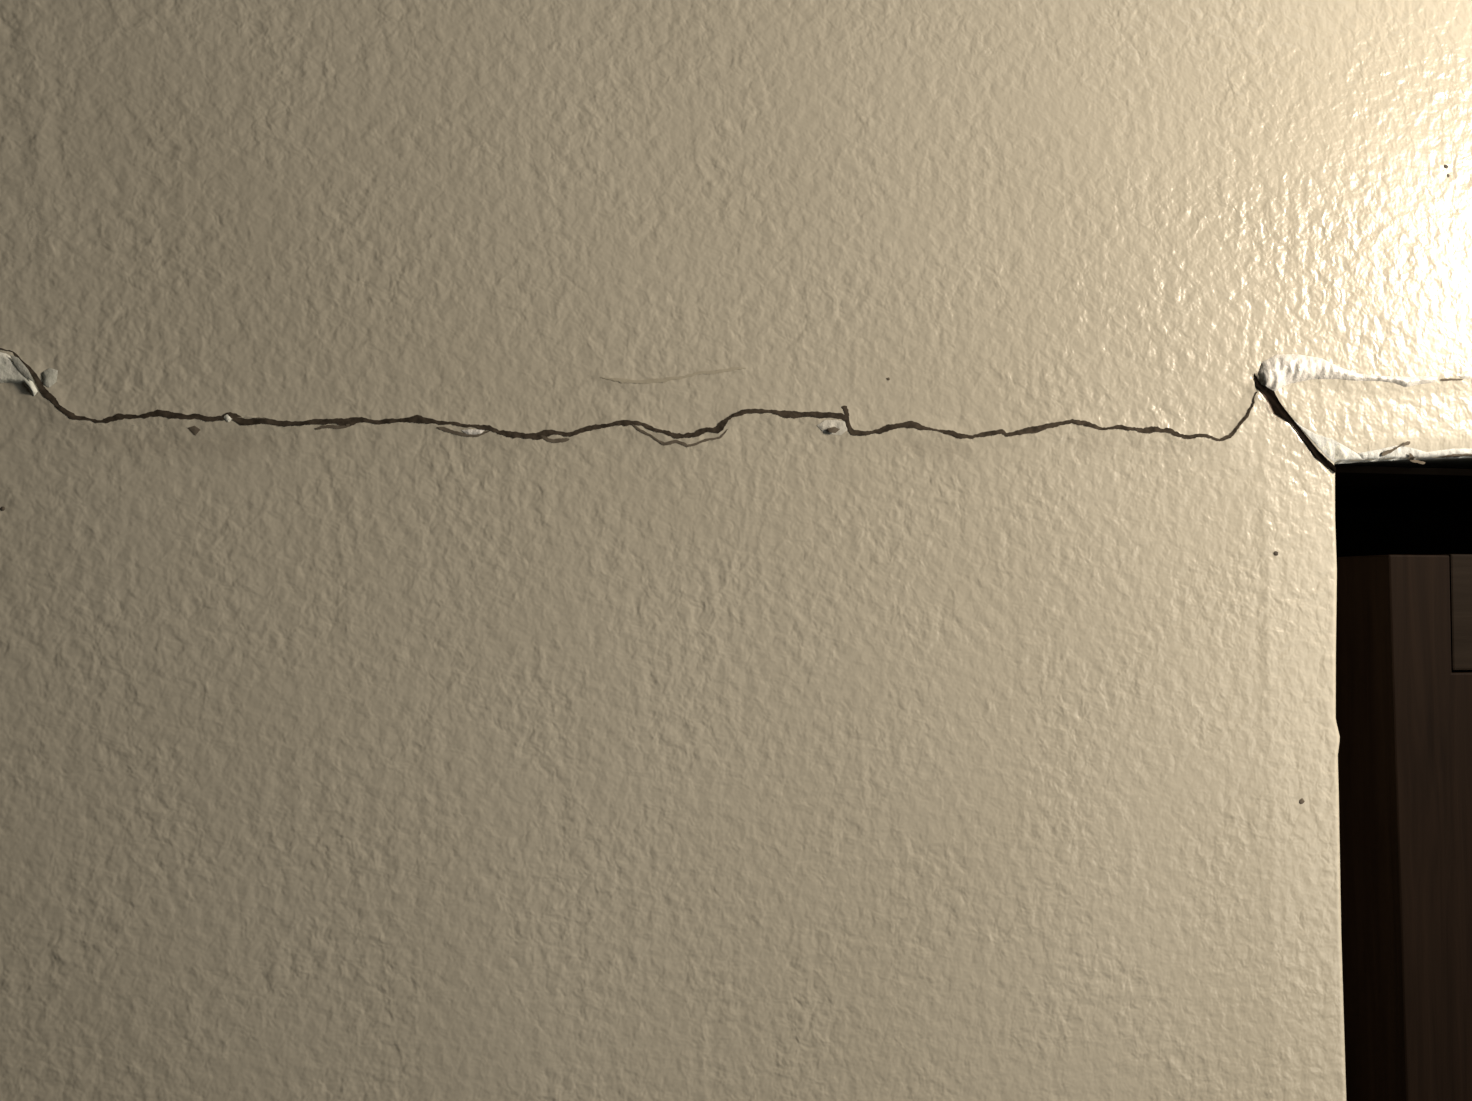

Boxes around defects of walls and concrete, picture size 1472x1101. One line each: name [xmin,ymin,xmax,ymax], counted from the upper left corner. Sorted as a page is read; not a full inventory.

spalling [0,352,58,396]
peeling [1259,354,1437,391]
crack [0,348,1336,473]
spalling [1294,420,1472,464]